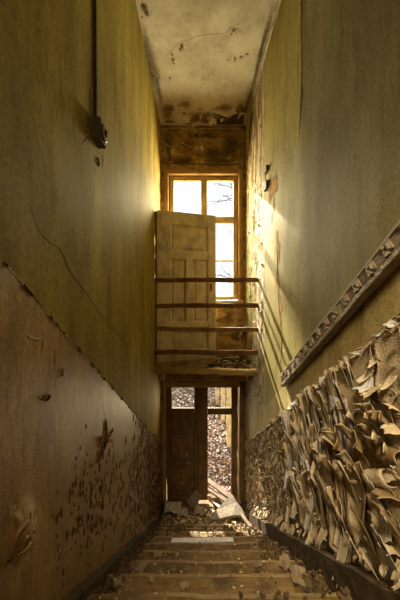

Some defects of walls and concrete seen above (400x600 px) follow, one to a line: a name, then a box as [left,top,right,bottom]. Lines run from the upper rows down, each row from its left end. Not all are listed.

crack [30,206,133,348]
peeling [0,257,163,567]
peeling [245,312,400,591]